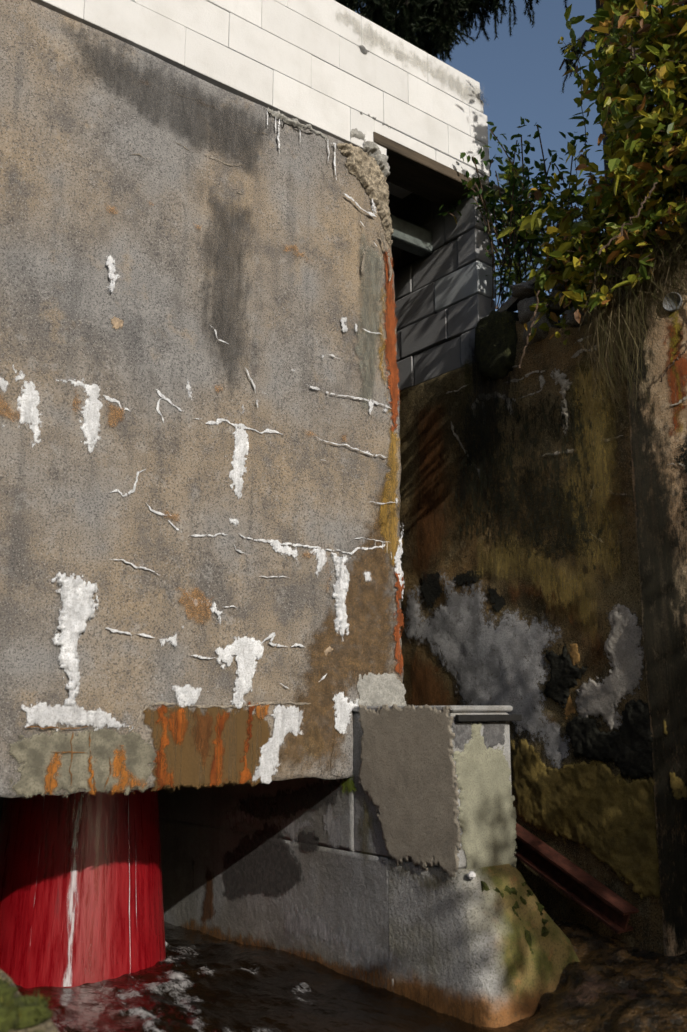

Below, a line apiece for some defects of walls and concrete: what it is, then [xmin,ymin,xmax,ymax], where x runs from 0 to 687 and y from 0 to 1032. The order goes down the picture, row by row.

spalling [337,128,394,246]
crack [307,384,392,412]
efflorescence [550,368,573,437]
rust [664,311,687,435]
rust [379,251,452,706]
leakage [420,572,444,609]
leakage [454,569,506,612]
rust [45,753,62,794]
rust [112,701,311,792]
leakage [184,494,404,899]
peeling [405,573,661,902]
peeling [669,772,687,800]